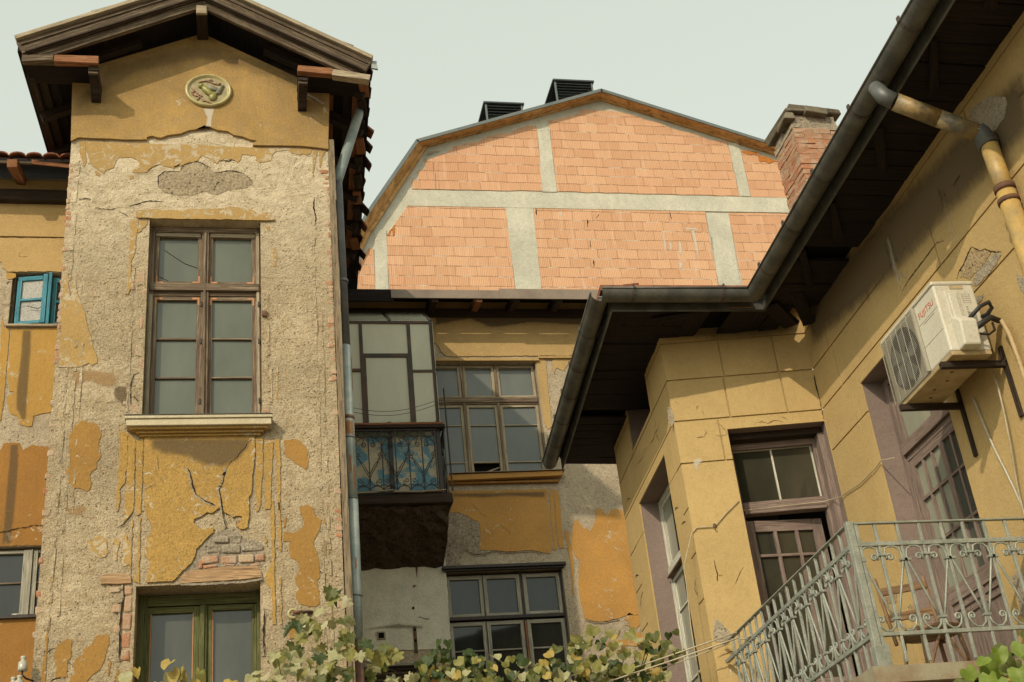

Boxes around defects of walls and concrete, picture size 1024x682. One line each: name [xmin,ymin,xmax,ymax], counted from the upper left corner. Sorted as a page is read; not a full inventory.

spalling [969,96,1007,131]
flaking render [0,141,330,427]
spalling [959,250,1001,304]
flaking render [66,420,101,491]
crack [185,440,252,528]
flaking render [87,430,343,639]
flaking render [361,489,643,651]
flaking render [0,591,119,682]